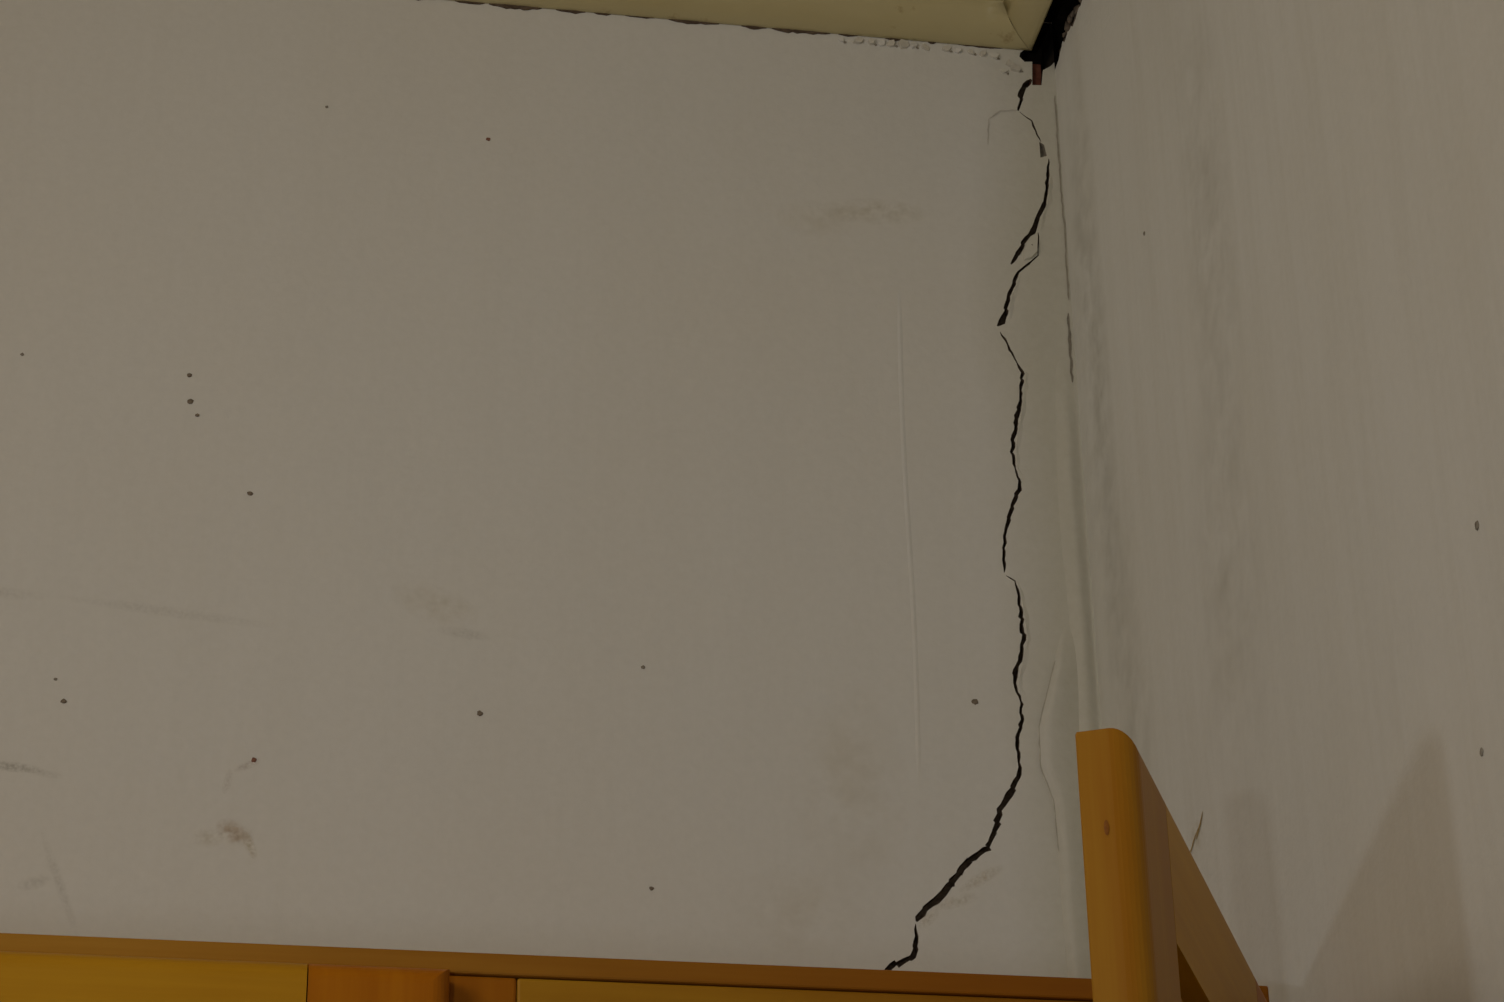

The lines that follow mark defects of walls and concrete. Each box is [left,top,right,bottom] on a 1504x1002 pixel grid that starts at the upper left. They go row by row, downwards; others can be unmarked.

crack [455,0,1074,970]